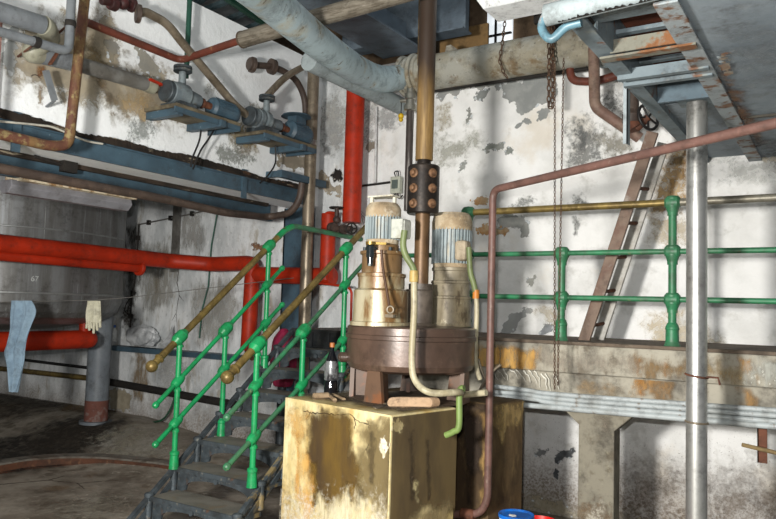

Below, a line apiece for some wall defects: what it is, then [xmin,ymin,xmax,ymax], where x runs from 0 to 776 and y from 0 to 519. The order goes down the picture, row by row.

water stain [5,29,71,103]
water stain [84,8,167,83]
water stain [79,73,167,142]
spalling [436,76,558,129]
rust [724,70,754,124]
spalling [482,142,513,155]
spalling [476,214,530,238]
rust [634,355,686,400]
water stain [0,414,169,460]
water stain [284,408,383,519]
crack [303,410,368,429]
spalling [534,448,576,480]